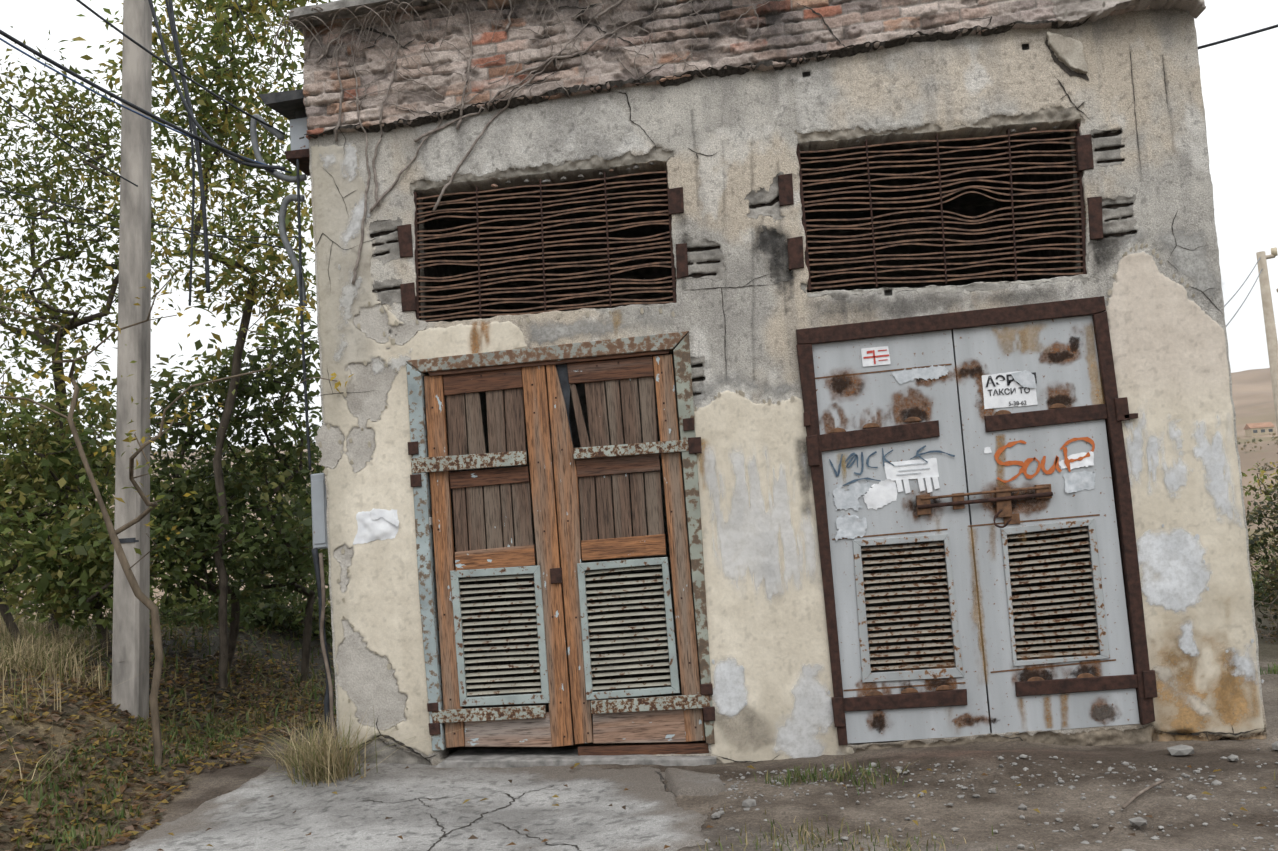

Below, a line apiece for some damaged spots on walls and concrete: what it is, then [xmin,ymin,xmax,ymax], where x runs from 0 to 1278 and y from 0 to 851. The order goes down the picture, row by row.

crack [299,0,1092,290]
flaking render [315,199,427,475]
corrosion [819,372,862,434]
corrosion [874,360,994,427]
peeling [1137,524,1210,656]
crack [336,718,436,765]
peeling [712,659,747,715]
peeling [774,665,834,758]
corrosion [867,710,885,732]
corrosion [857,665,957,697]
leakage [1156,645,1258,740]
crack [363,781,581,851]